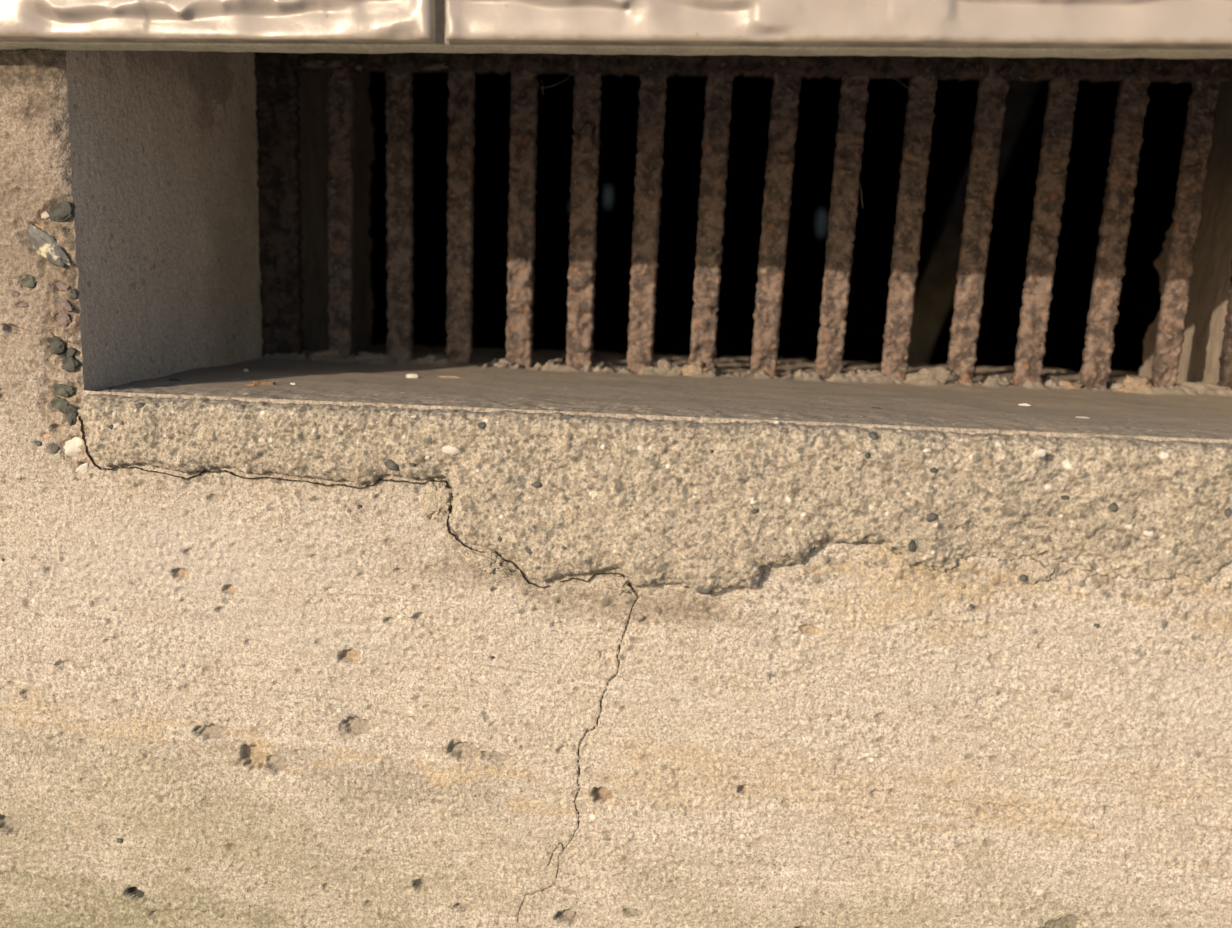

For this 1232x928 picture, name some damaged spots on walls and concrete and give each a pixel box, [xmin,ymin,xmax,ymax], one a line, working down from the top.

crack [78,416,638,922]